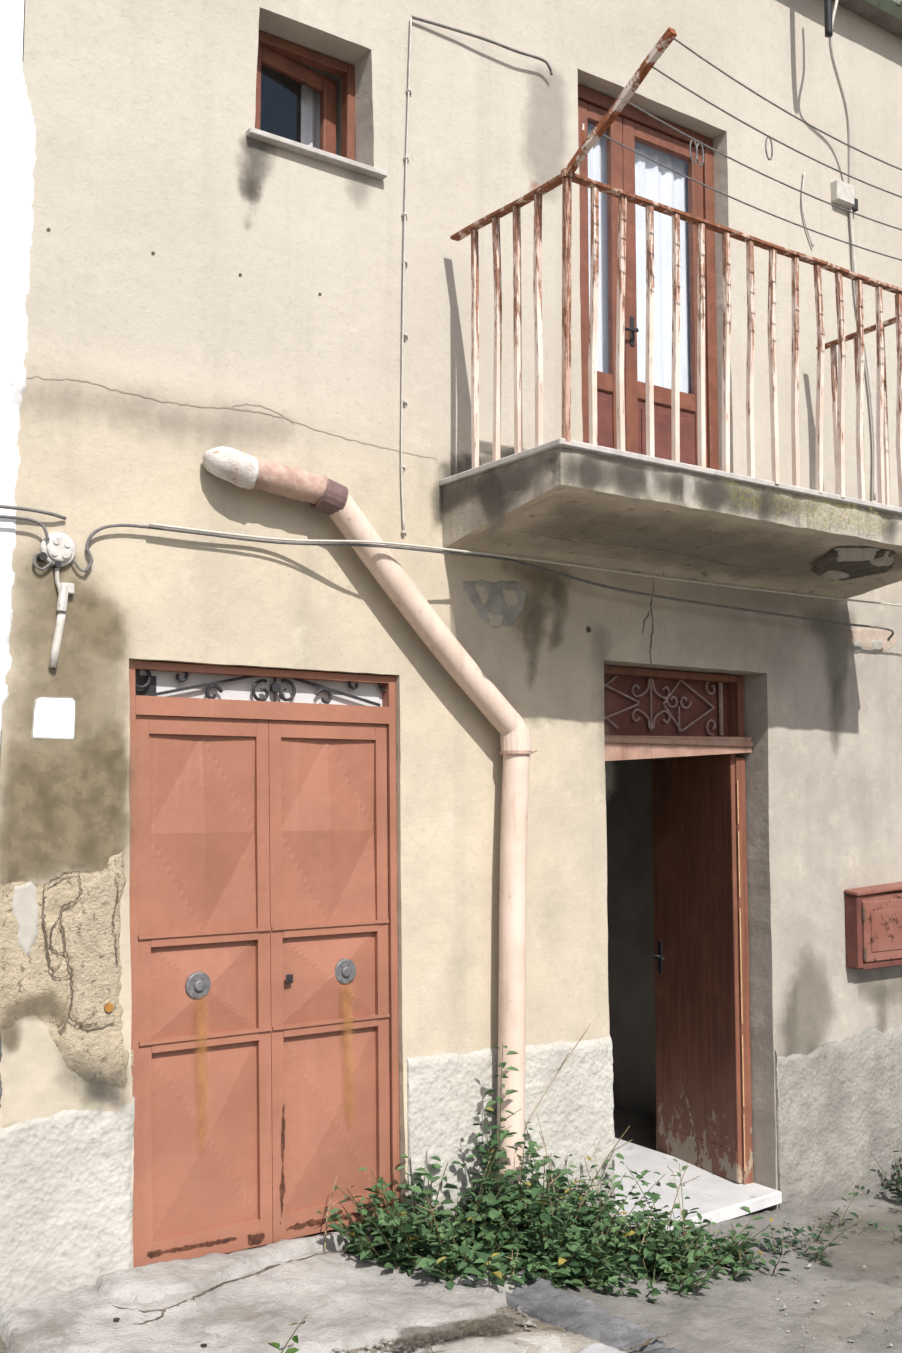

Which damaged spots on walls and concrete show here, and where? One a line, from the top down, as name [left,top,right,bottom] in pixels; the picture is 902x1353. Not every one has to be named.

damp [244,142,266,195]
crack [26,376,438,460]
damp [436,452,794,527]
spalling [810,547,896,581]
flaking render [463,579,528,629]
damp [5,569,124,879]
flaking render [0,851,133,1089]
rust [147,1233,265,1258]